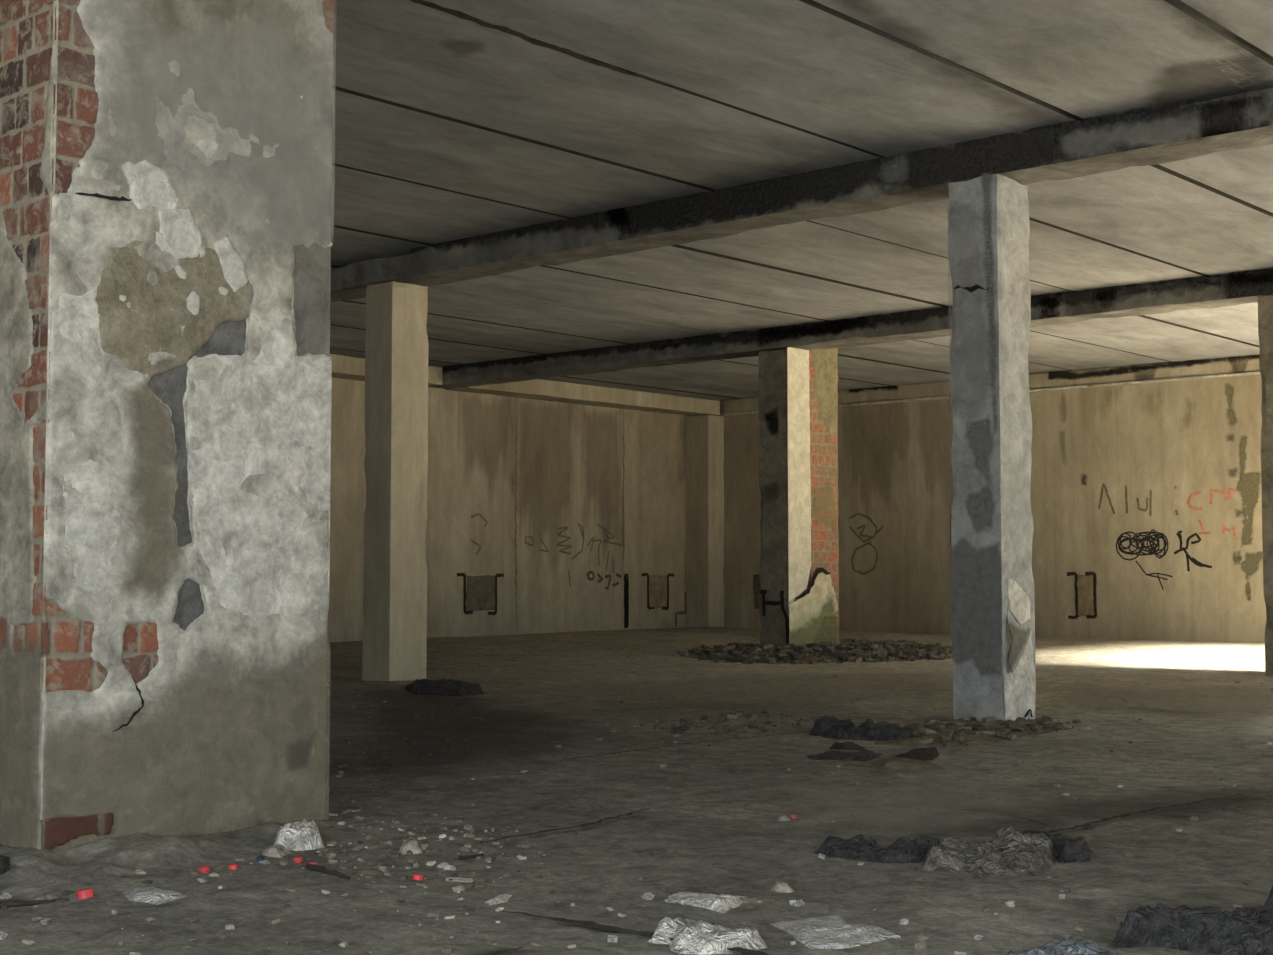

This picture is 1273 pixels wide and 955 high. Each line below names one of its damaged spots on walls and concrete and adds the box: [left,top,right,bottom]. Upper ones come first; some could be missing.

peeling [0,0,334,692]
flaking render [789,350,839,645]
flaking render [40,813,114,850]
crack [112,680,144,732]